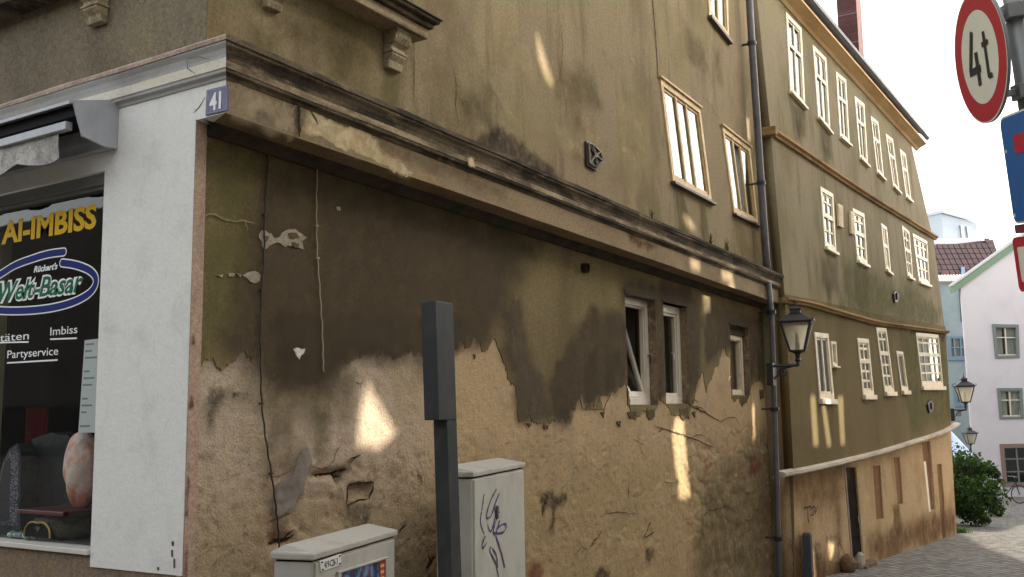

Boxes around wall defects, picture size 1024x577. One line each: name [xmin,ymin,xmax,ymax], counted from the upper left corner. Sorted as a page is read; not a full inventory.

peeling [232,83,414,177]
spalling [216,271,261,283]
spalling [259,229,307,250]
damp [231,162,626,422]
crack [269,444,361,477]
flaking render [195,350,437,577]
flaking render [454,338,775,577]
crack [633,399,741,458]